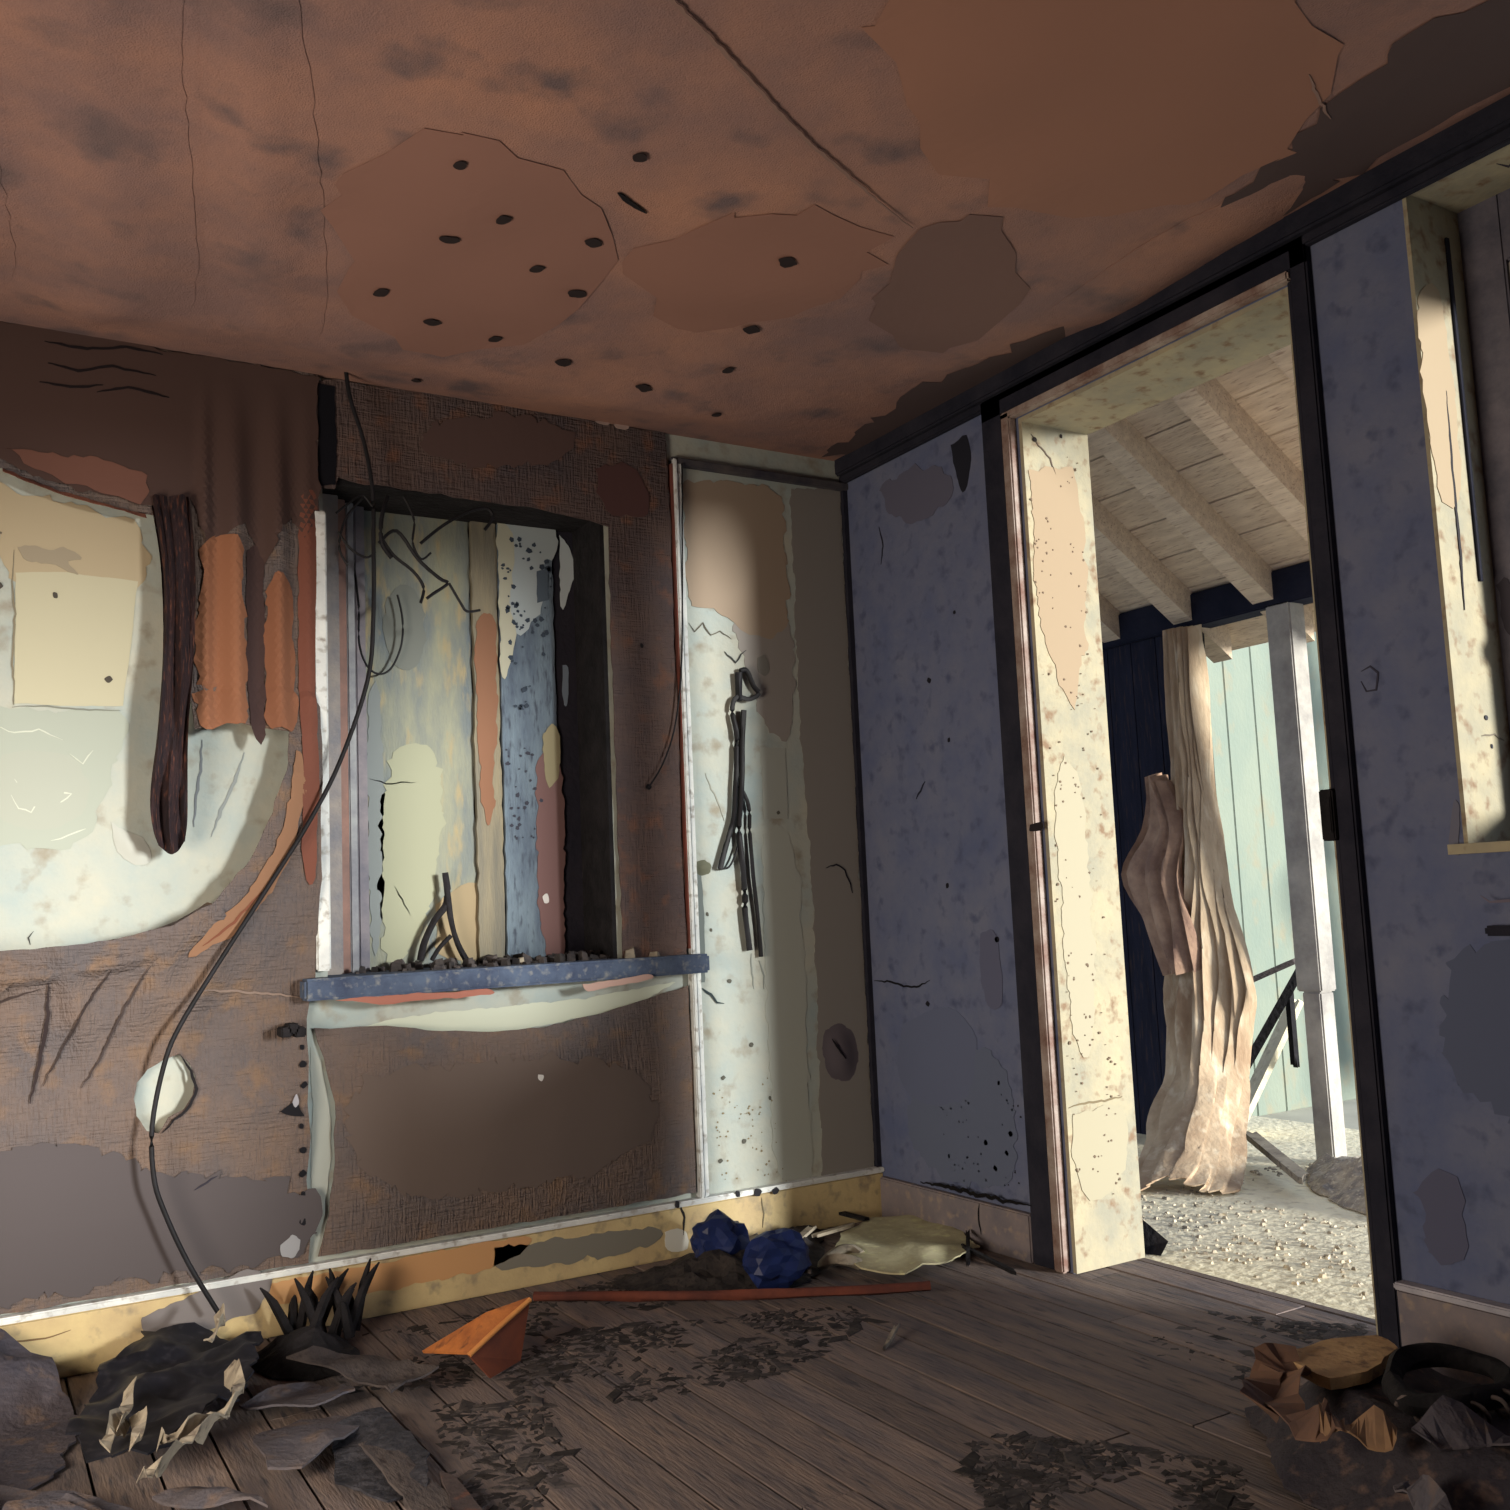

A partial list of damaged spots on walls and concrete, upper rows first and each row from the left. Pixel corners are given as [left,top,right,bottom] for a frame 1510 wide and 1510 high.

peeling [496,523,574,679]
peeling [697,874,712,954]